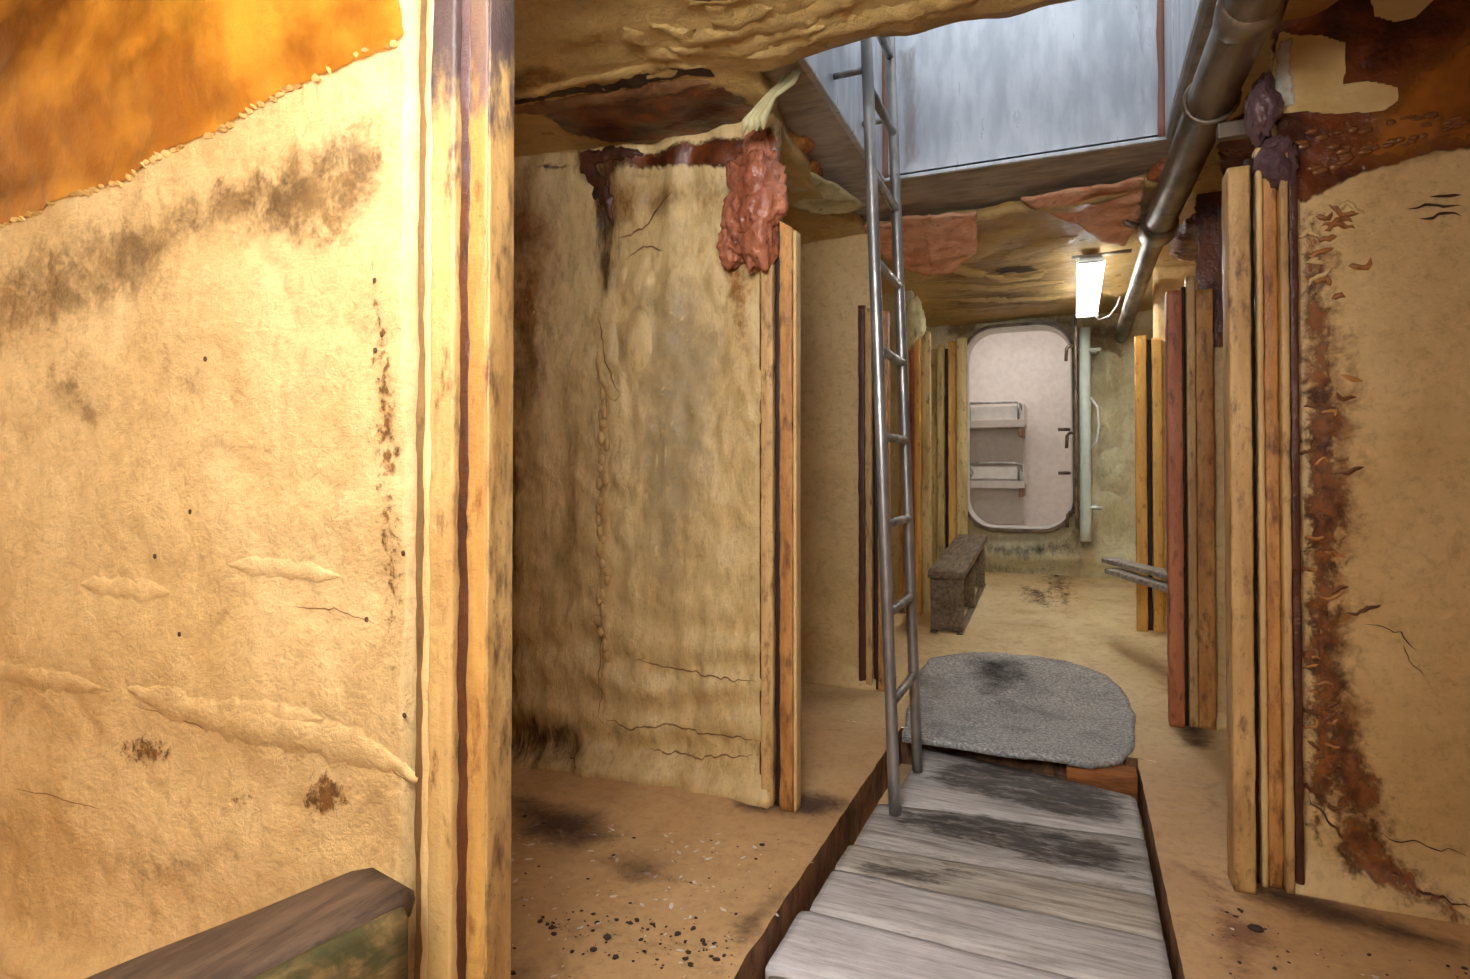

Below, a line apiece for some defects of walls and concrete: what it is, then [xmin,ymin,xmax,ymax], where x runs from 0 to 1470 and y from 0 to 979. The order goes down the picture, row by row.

peeling [0,0,403,228]
peeling [1271,0,1470,202]
water stain [92,232,166,291]
water stain [192,144,378,231]
water stain [514,198,549,371]
crack [620,192,672,259]
rust [1288,173,1463,921]
crack [597,603,760,761]
rust [123,737,169,766]
rust [303,772,351,815]
crack [1308,794,1341,837]
crack [1419,890,1470,907]